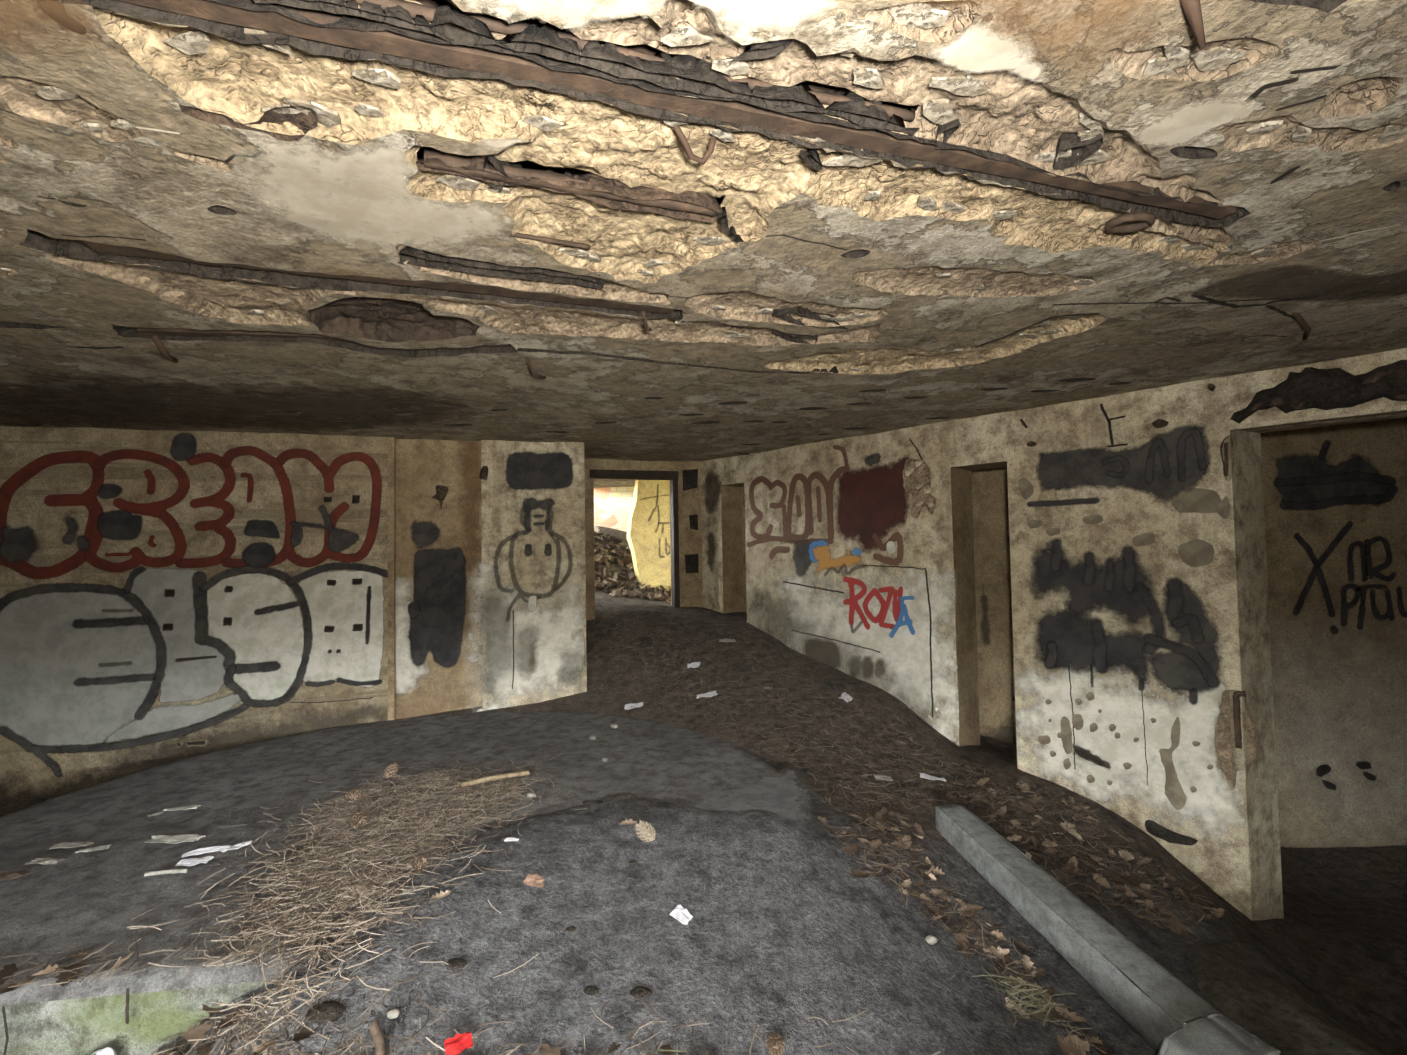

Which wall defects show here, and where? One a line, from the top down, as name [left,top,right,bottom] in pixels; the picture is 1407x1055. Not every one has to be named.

spalling [0,0,1407,405]
spalling [679,401,748,424]
spalling [1152,419,1168,428]